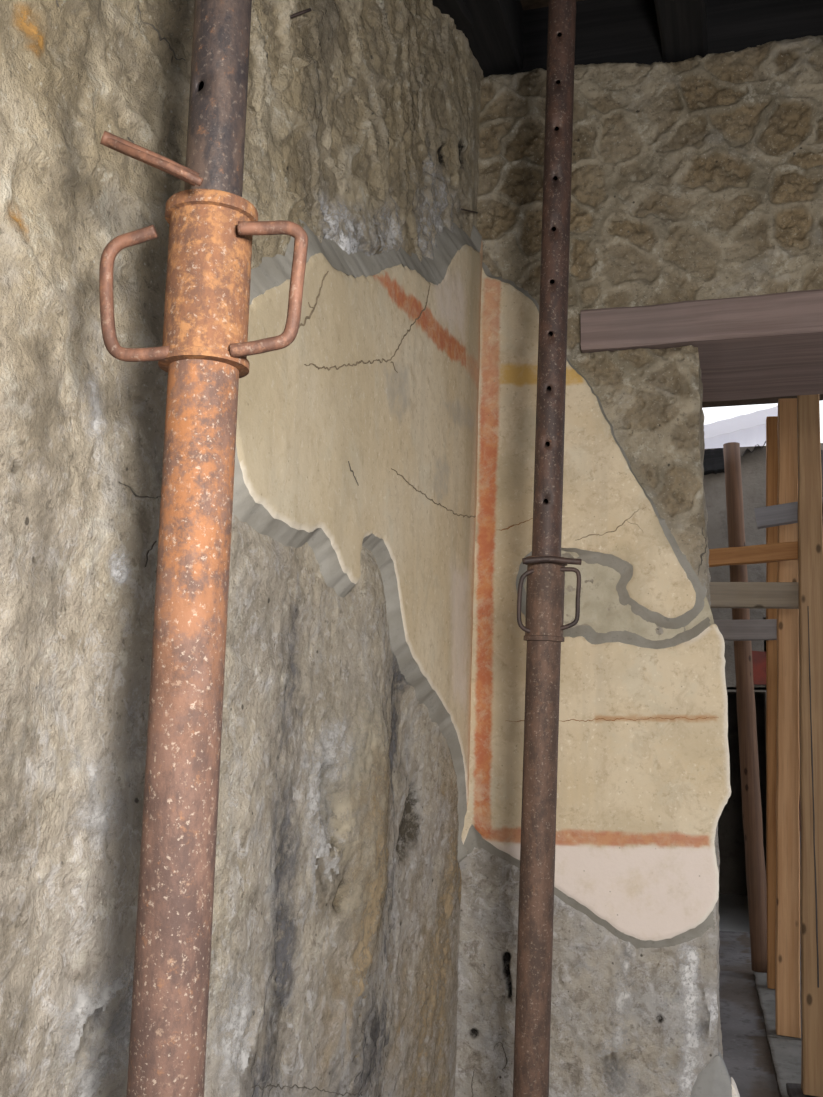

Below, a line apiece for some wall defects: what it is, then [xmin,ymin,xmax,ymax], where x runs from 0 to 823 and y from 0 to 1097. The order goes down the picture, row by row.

crack [299,271,329,328]
crack [304,282,430,373]
crack [391,468,476,518]
flaking render [561,550,714,641]
flaking render [319,766,341,846]
flaking render [396,789,419,860]
spalling [503,952,512,998]
crack [252,1084,362,1096]
flaking render [690,1052,740,1097]